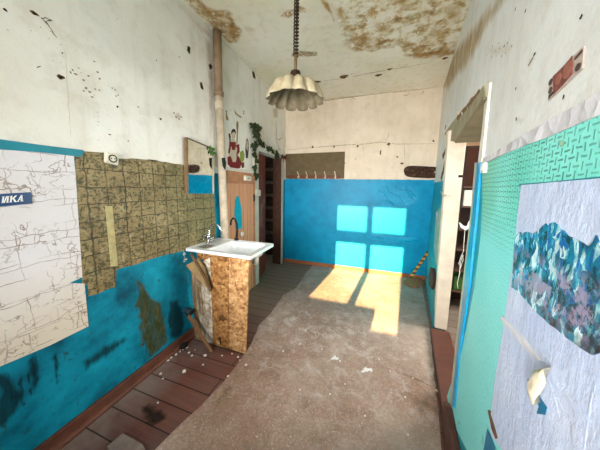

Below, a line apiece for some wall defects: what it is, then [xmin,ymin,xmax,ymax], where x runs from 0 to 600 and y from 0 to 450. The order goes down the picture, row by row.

leakage [176,0,258,61]
leakage [319,0,508,96]
leakage [0,351,44,431]
leakage [79,333,131,375]
leakage [143,405,164,424]
leakage [139,282,186,356]